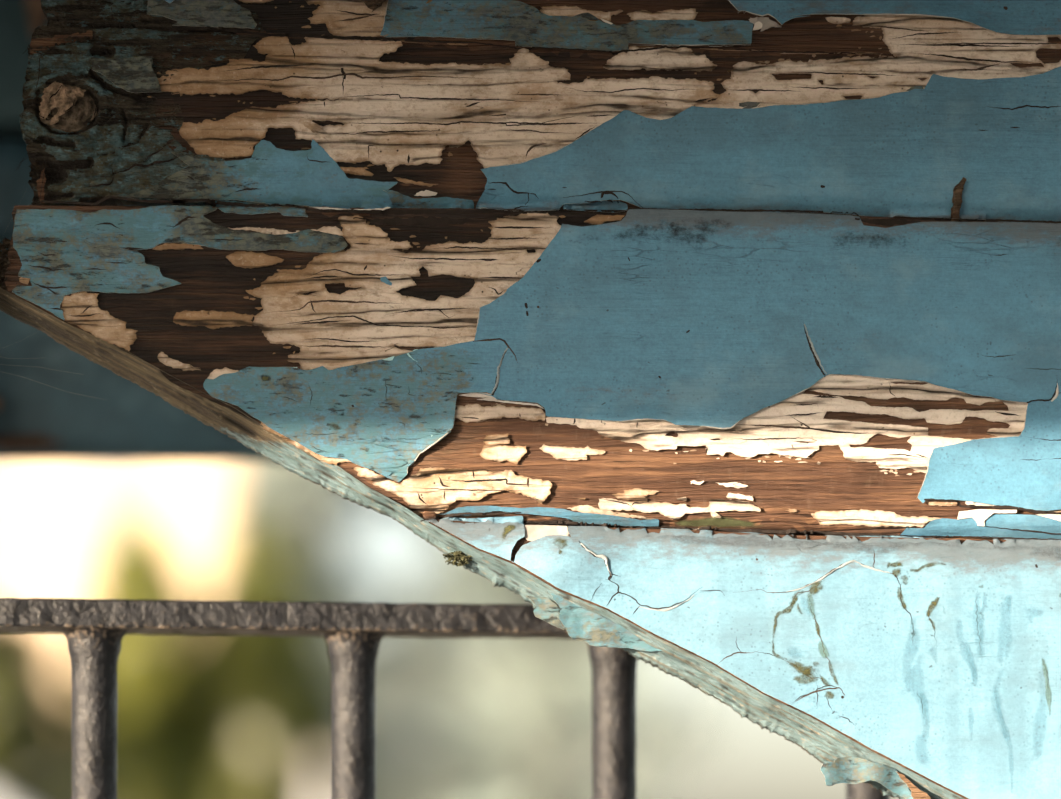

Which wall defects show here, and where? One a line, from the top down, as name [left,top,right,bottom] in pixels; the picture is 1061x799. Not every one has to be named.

peeling [61,0,1061,541]
crack [804,324,827,377]
crack [982,355,1061,403]
crack [420,498,1061,722]